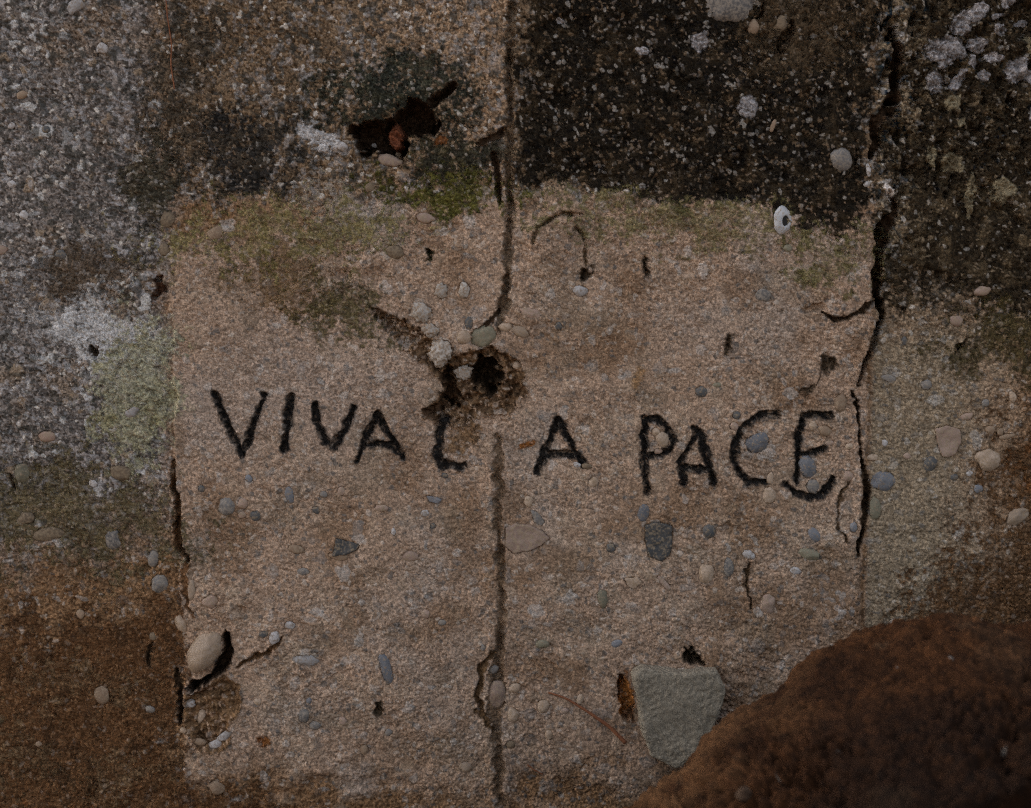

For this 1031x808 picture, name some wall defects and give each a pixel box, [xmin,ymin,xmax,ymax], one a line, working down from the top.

spalling [347,80,458,164]
crack [475,0,516,333]
leakage [116,0,1031,320]
crack [867,27,903,159]
crack [821,196,898,323]
spalling [375,308,528,458]
crack [170,459,195,619]
crack [836,384,871,557]
spalling [182,630,282,755]
crack [473,433,507,806]